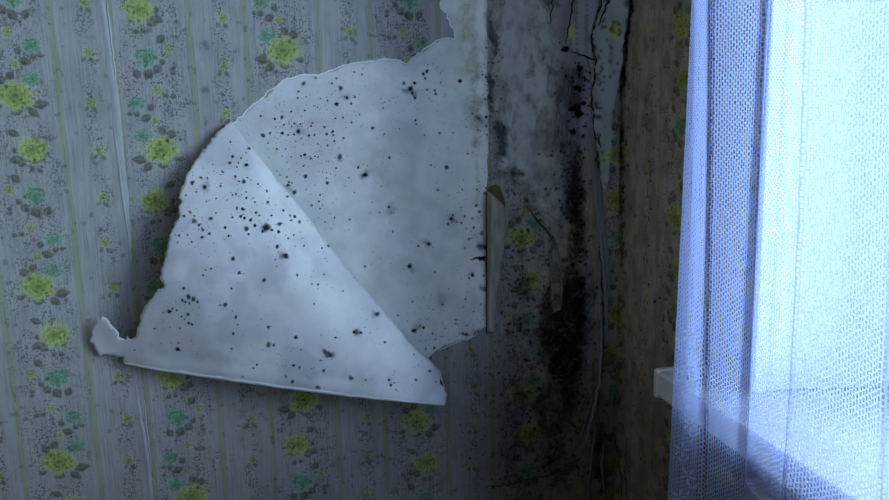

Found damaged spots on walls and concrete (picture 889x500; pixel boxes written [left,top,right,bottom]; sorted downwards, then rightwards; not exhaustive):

water stain [461,11,508,162]
crack [550,0,610,168]
mould [162,287,238,335]
mould [206,147,305,267]
mould [261,101,344,229]
peeling [90,0,629,406]
mould [447,203,487,261]
water stain [483,62,607,500]
crack [597,251,605,400]
water stain [610,118,637,272]